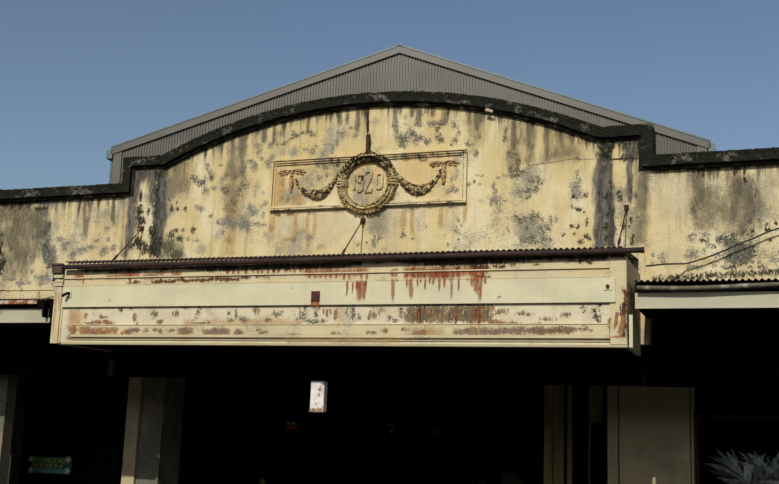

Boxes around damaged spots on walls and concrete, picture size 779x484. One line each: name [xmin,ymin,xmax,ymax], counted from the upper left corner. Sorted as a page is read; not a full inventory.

leakage [410,107,447,123]
leakage [111,159,196,259]
leakage [563,139,648,248]
leakage [691,166,778,242]
leakage [0,201,48,276]
corrosion [391,263,516,297]
corrosion [65,312,244,339]
peeling [345,304,581,333]
corrosion [452,296,593,335]
corrosion [607,289,630,338]